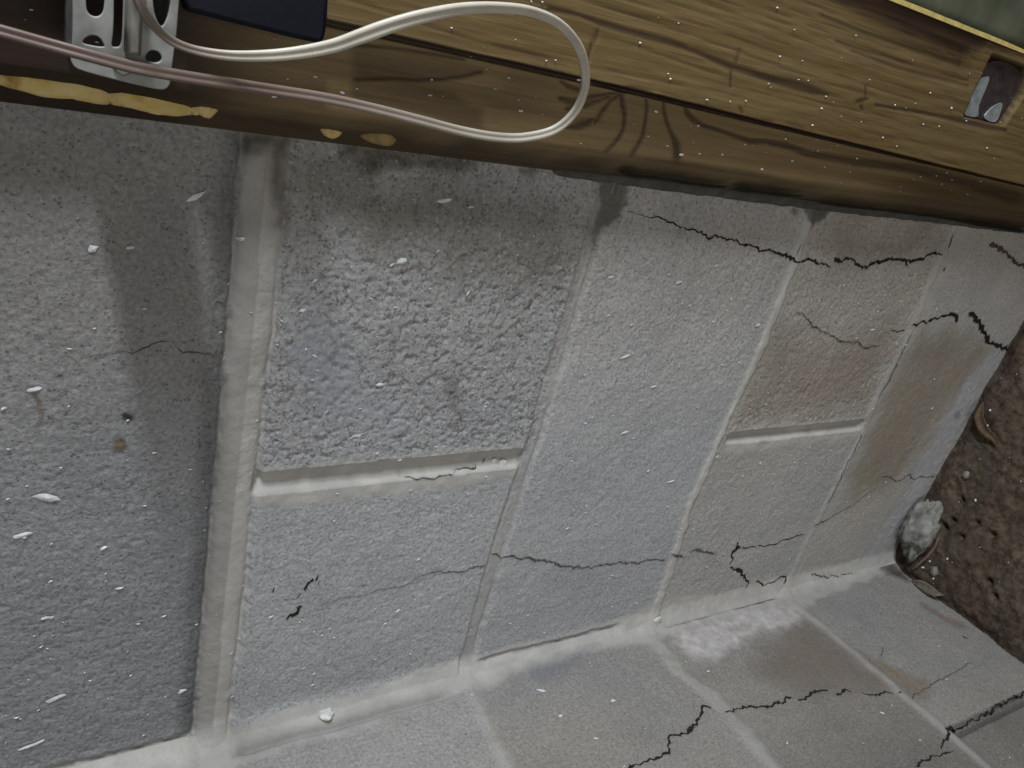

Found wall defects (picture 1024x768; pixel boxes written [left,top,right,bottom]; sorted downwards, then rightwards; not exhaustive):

damp [597,182,626,229]
crack [619,169,1024,271]
crack [318,435,935,607]
crack [628,662,972,768]
crack [916,691,1024,767]